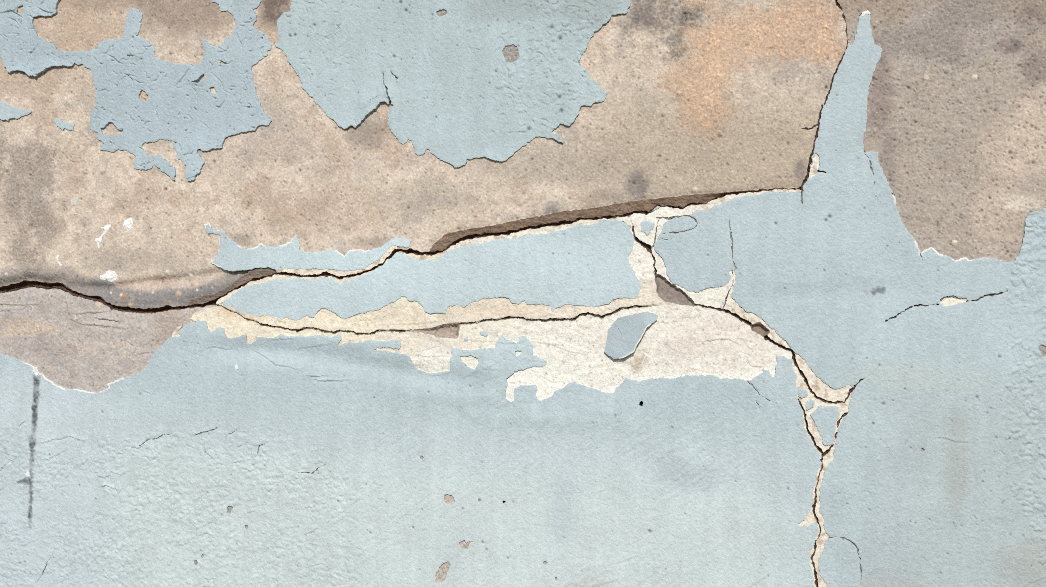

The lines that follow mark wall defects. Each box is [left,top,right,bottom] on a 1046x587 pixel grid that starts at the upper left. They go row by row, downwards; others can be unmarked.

spalling [0,204,852,587]
crack [0,0,863,403]
peeling [0,0,1046,310]
crack [798,399,862,587]
crack [885,290,1008,322]